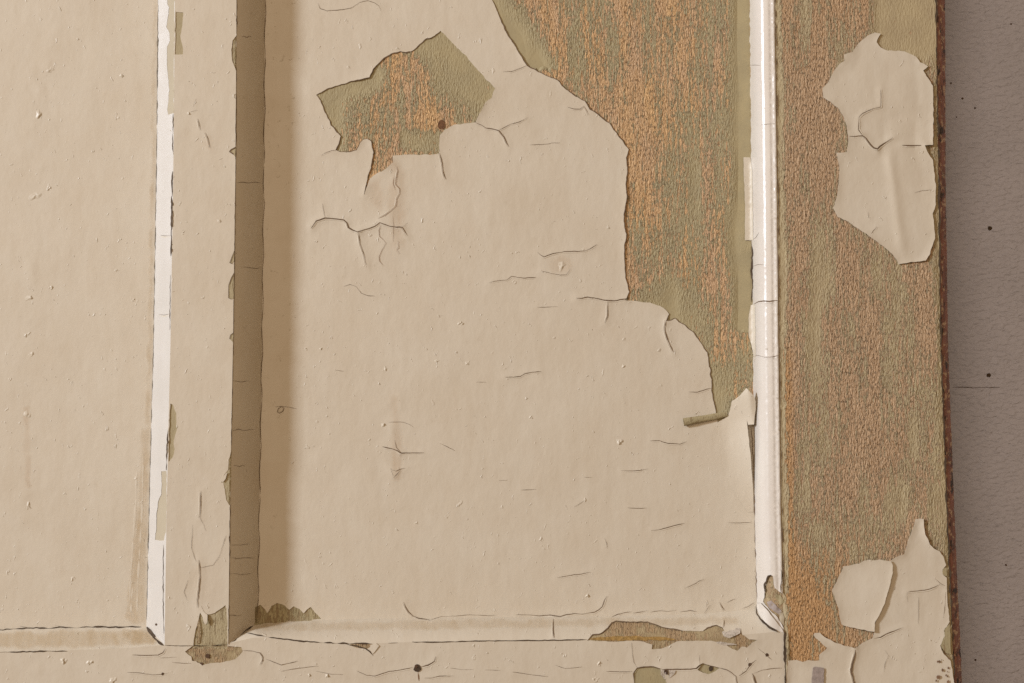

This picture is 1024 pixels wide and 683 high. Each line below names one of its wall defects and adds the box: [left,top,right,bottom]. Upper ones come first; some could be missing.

peeling [317,31,495,194]
crack [476,119,527,147]
crack [311,169,407,296]
crack [491,244,598,284]
peeling [492,0,756,512]
crack [554,297,627,322]
peeling [757,0,954,683]
peeling [254,603,321,625]
peeling [185,605,243,665]
peeling [588,620,756,651]
crack [246,650,473,680]
crack [662,649,774,683]